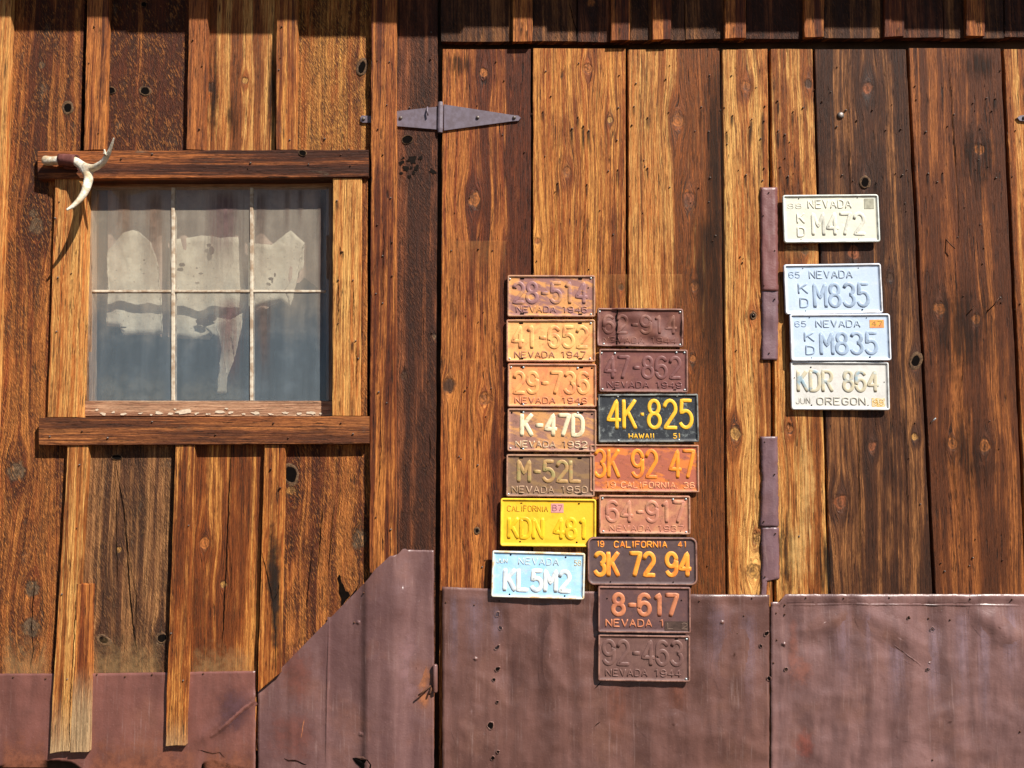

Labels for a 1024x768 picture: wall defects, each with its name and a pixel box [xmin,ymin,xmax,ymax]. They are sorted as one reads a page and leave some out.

peeling [96,408,322,416]
crack [114,461,140,668]